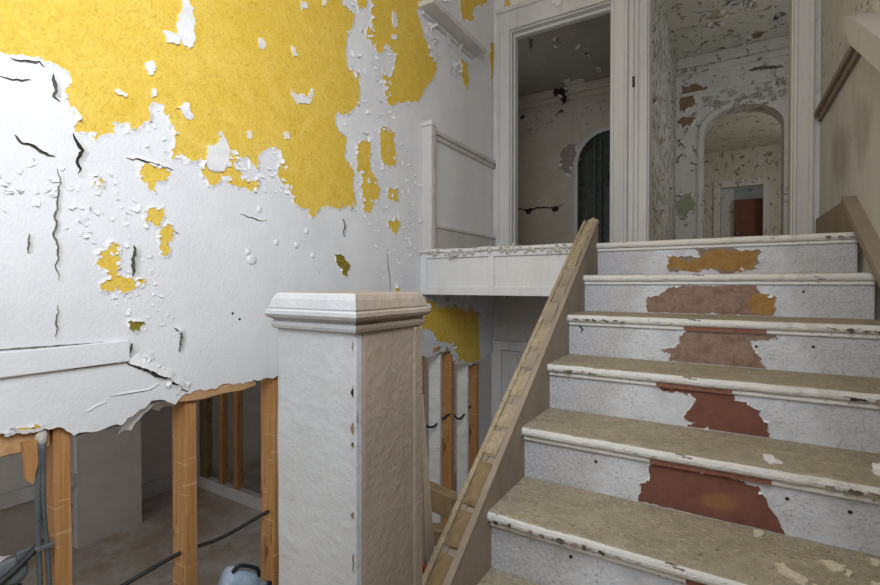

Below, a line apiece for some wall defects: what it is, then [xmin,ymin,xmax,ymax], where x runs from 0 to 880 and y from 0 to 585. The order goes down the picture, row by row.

crack [126,153,173,170]
crack [15,132,89,281]
peeling [0,0,470,395]
crack [518,204,563,214]
peeling [666,247,766,274]
peeling [645,285,778,317]
crack [0,305,102,351]
crack [58,343,138,371]
peeling [420,295,482,366]
peeling [659,327,781,370]
peeling [656,382,772,439]
peeling [633,459,797,538]